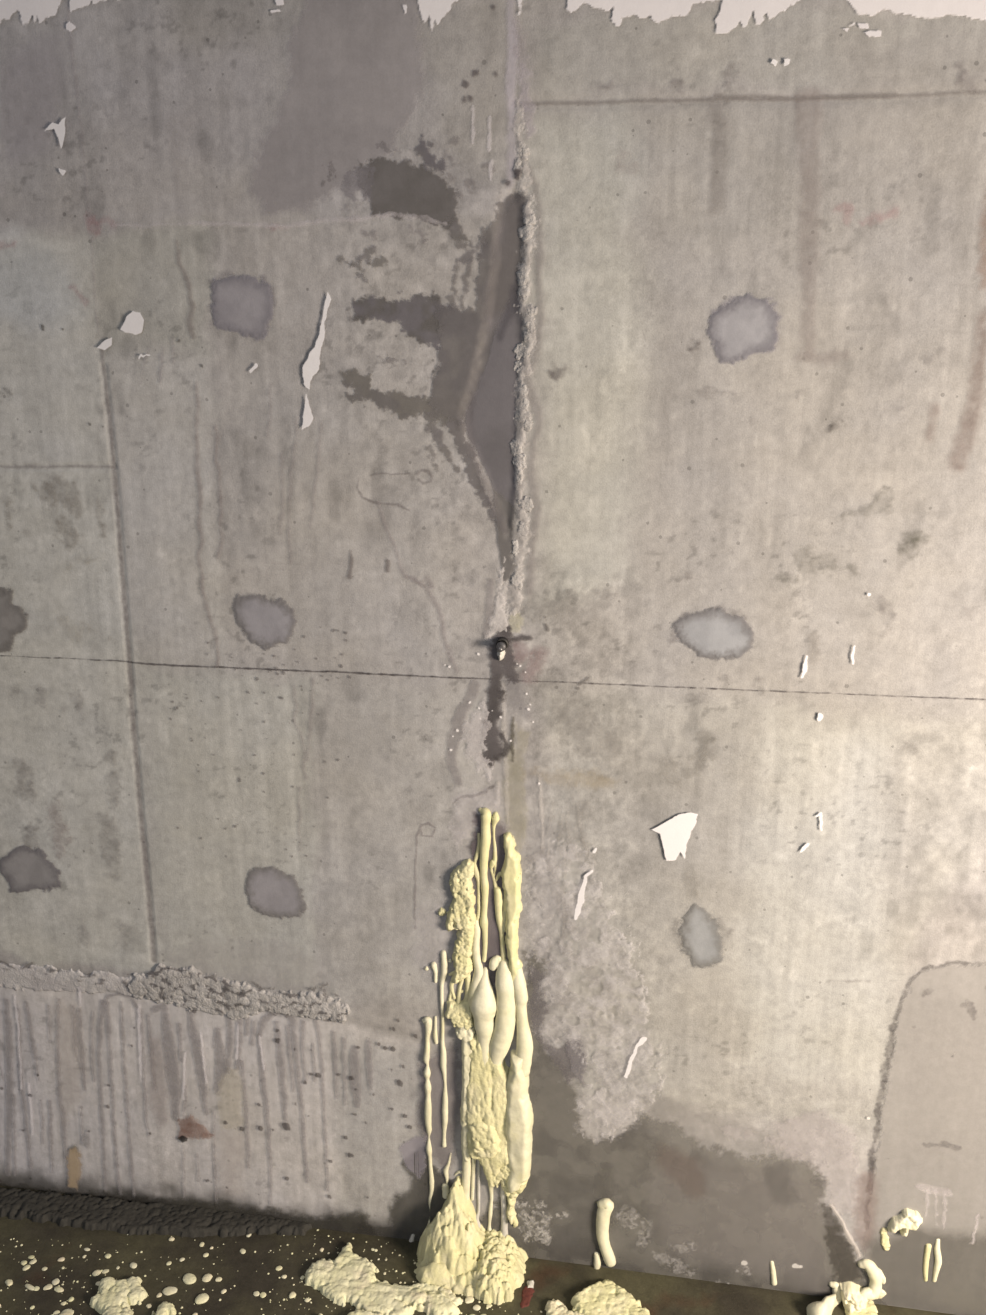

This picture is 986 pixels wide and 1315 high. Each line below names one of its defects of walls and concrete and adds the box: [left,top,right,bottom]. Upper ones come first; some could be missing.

damp [251,0,530,523]
damp [0,994,373,1194]
damp [372,1150,452,1241]
damp [479,868,986,1315]